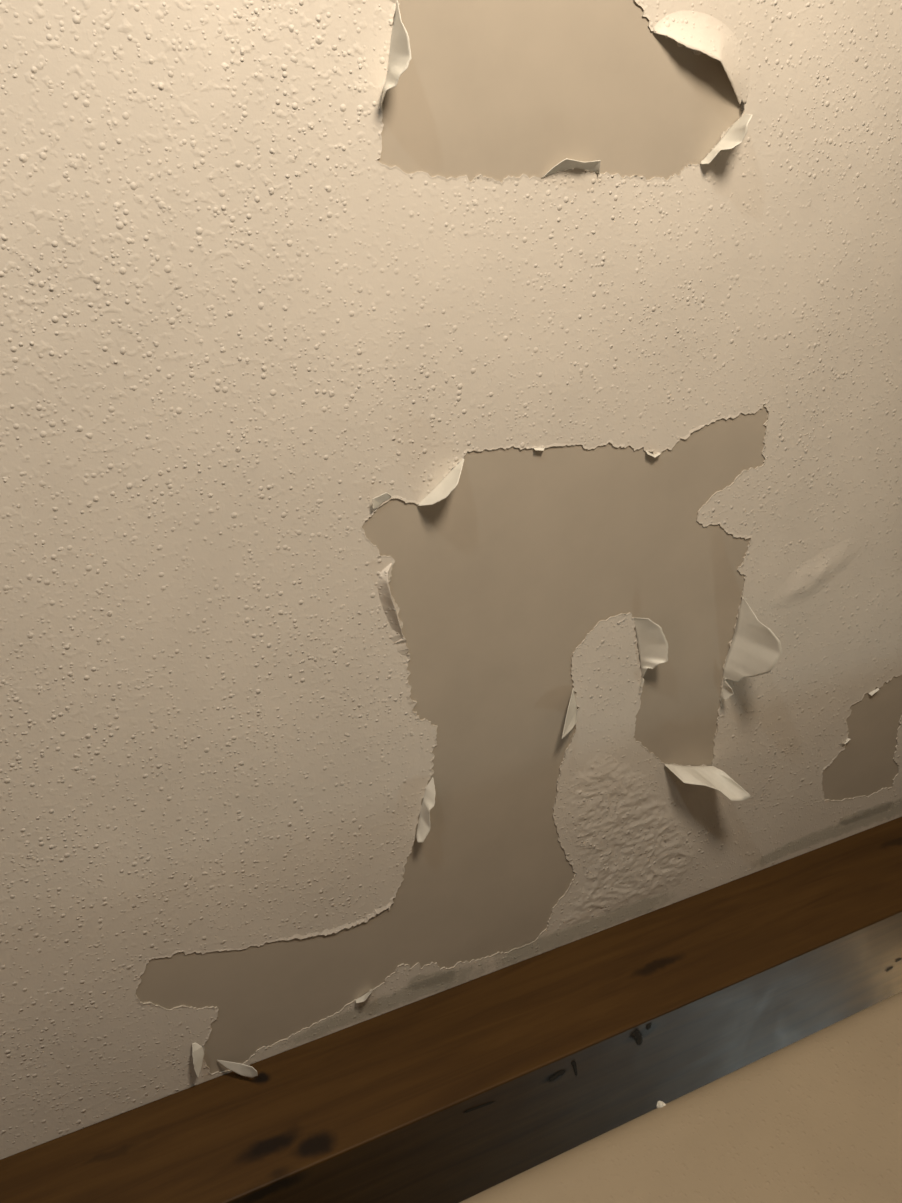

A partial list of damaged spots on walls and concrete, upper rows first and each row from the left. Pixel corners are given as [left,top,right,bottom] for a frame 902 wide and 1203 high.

peeling [375,0,753,186]
peeling [134,402,783,1078]
peeling [820,674,902,803]